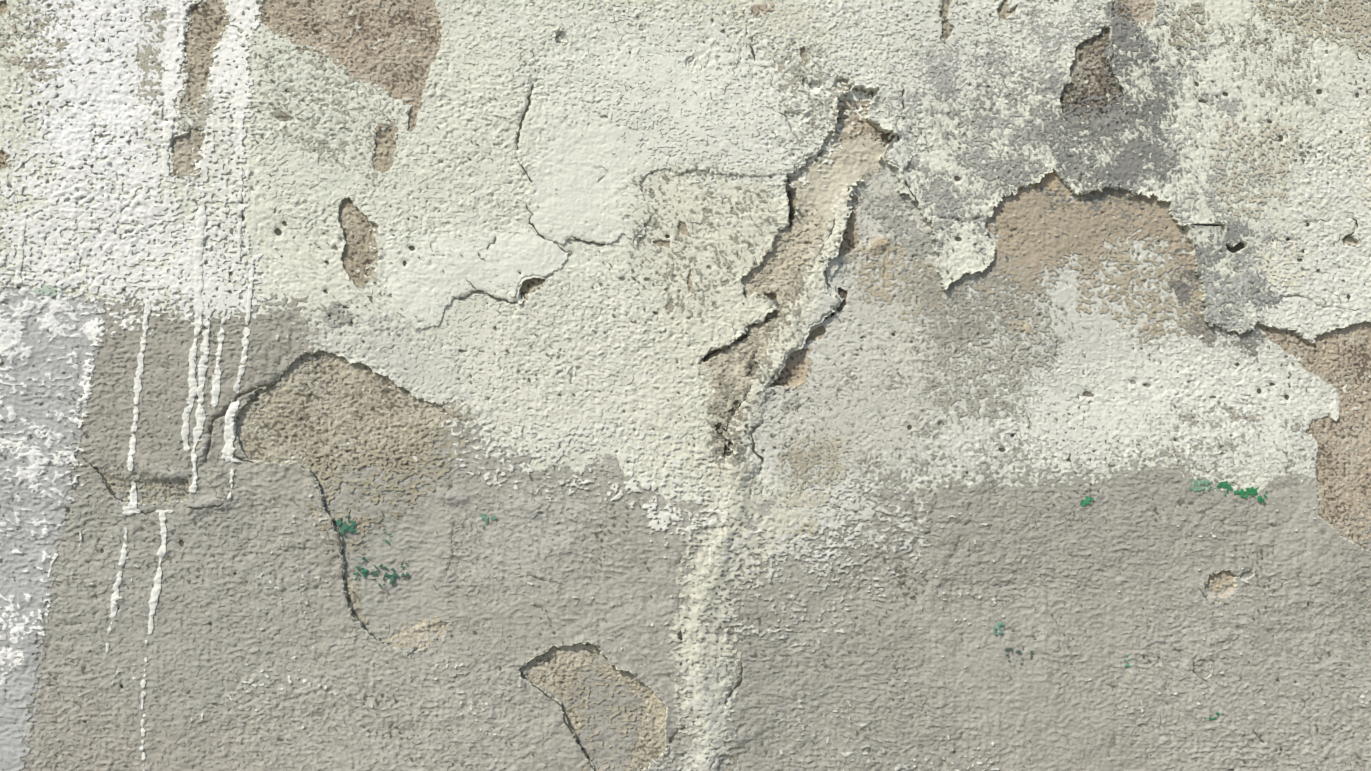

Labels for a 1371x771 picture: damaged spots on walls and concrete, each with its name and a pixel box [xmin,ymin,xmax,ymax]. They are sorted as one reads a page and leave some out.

flaking render [255,0,442,173]
peeling [1060,0,1155,130]
crack [389,0,818,313]
crack [819,215,848,288]
flaking render [339,32,1371,551]
crack [904,180,985,223]
peeling [236,350,476,659]
crack [656,245,1037,640]
flaking render [1204,569,1253,602]
peeling [520,642,673,771]
crack [1160,656,1269,726]